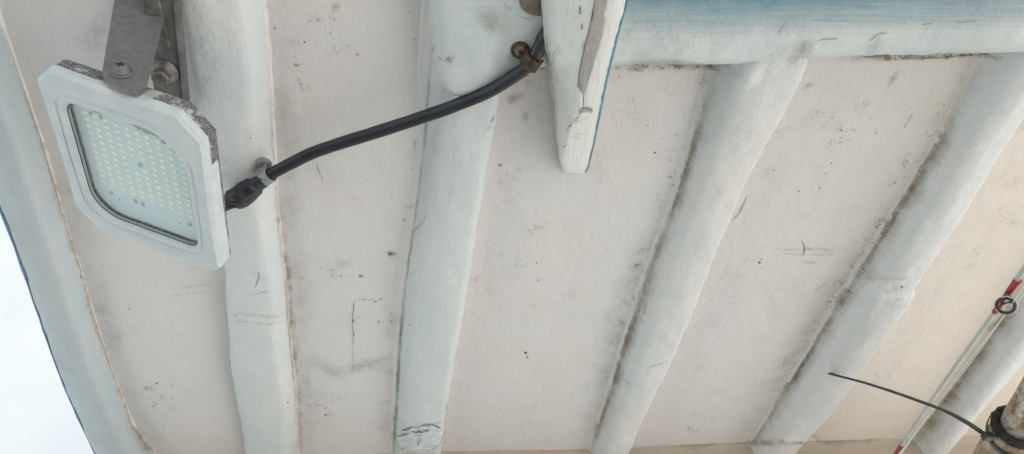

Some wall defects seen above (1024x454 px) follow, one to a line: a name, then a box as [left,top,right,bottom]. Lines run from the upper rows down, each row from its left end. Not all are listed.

peeling [397,424,444,451]